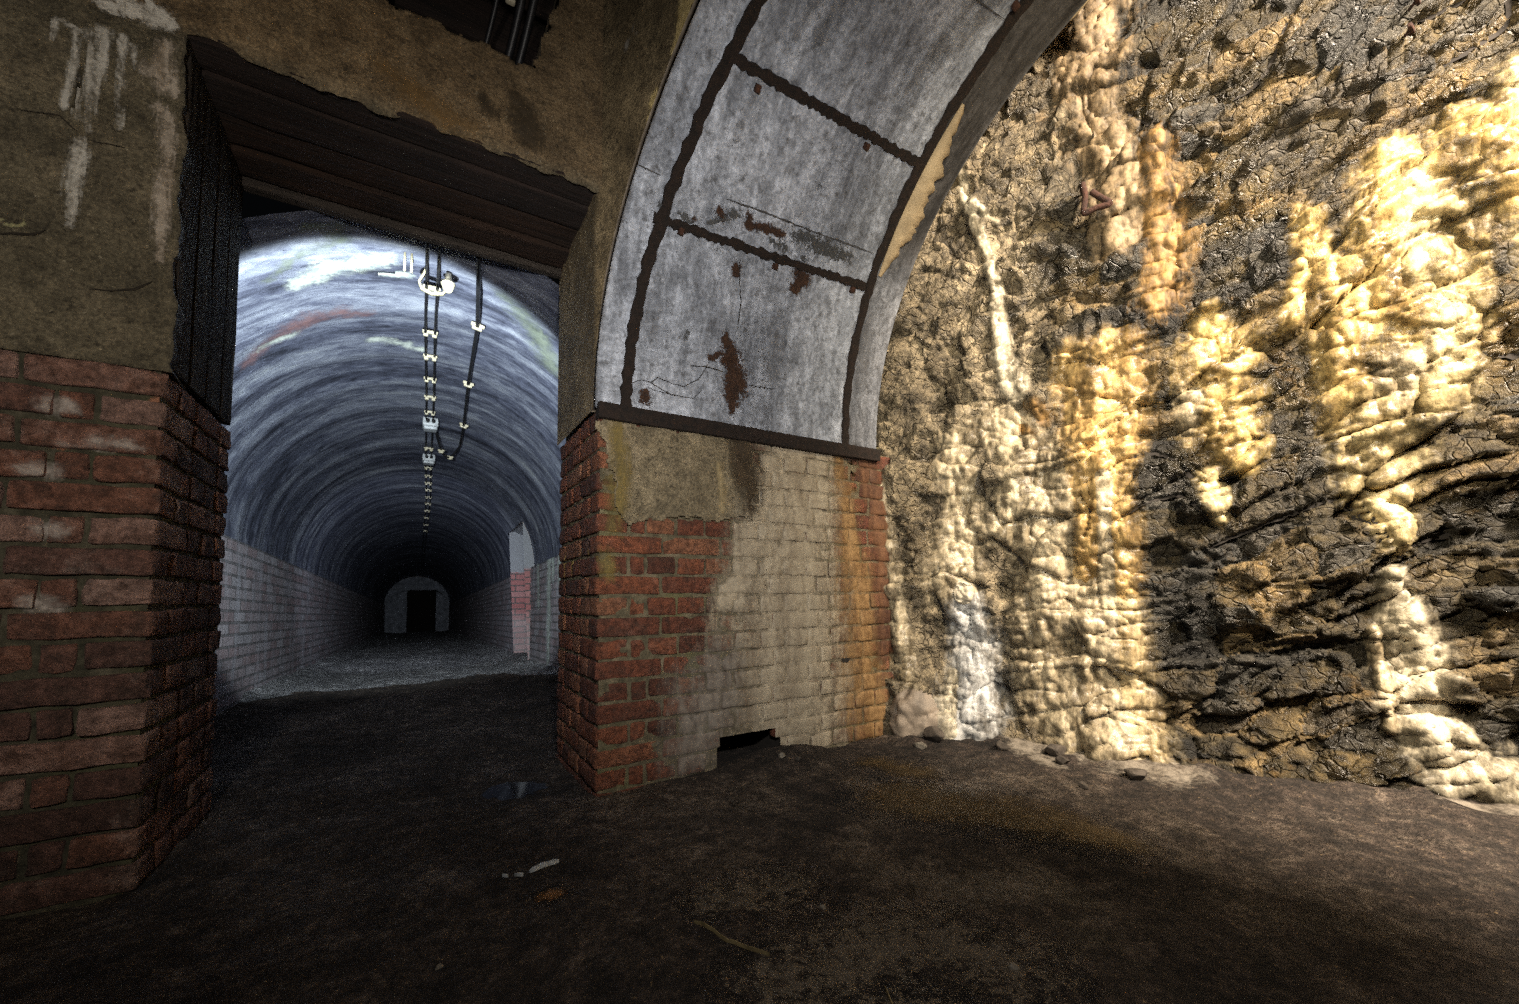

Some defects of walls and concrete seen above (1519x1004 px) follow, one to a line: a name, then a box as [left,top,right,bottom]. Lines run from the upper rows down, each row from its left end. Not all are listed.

crack [1229,10,1294,103]
crack [1410,0,1513,91]
damp [50,18,180,263]
rust [743,209,786,240]
rust [789,267,811,296]
rust [707,332,750,415]
peeling [595,419,759,526]
crack [1080,452,1463,563]
damp [671,440,854,775]
rust [836,457,891,739]
crack [1266,638,1342,646]
crack [1303,577,1348,586]